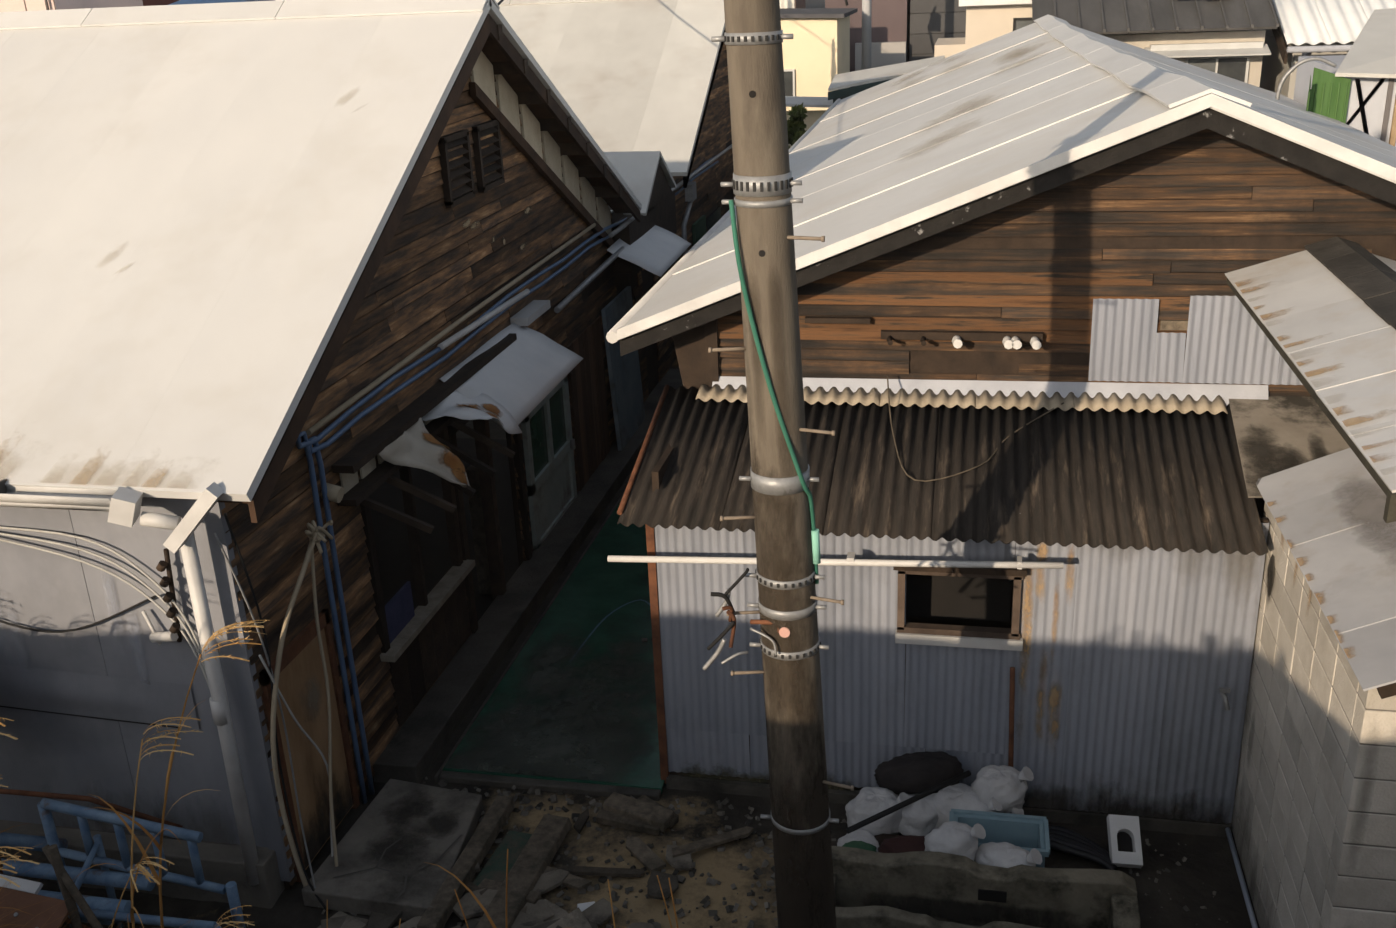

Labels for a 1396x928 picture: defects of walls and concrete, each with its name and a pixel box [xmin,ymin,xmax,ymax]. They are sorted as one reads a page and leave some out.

rust [1277,336,1335,377]
rust [1333,406,1373,427]
rust [423,433,467,484]
water stain [1346,487,1396,548]
rust [1021,544,1072,678]
rust [1287,540,1351,658]